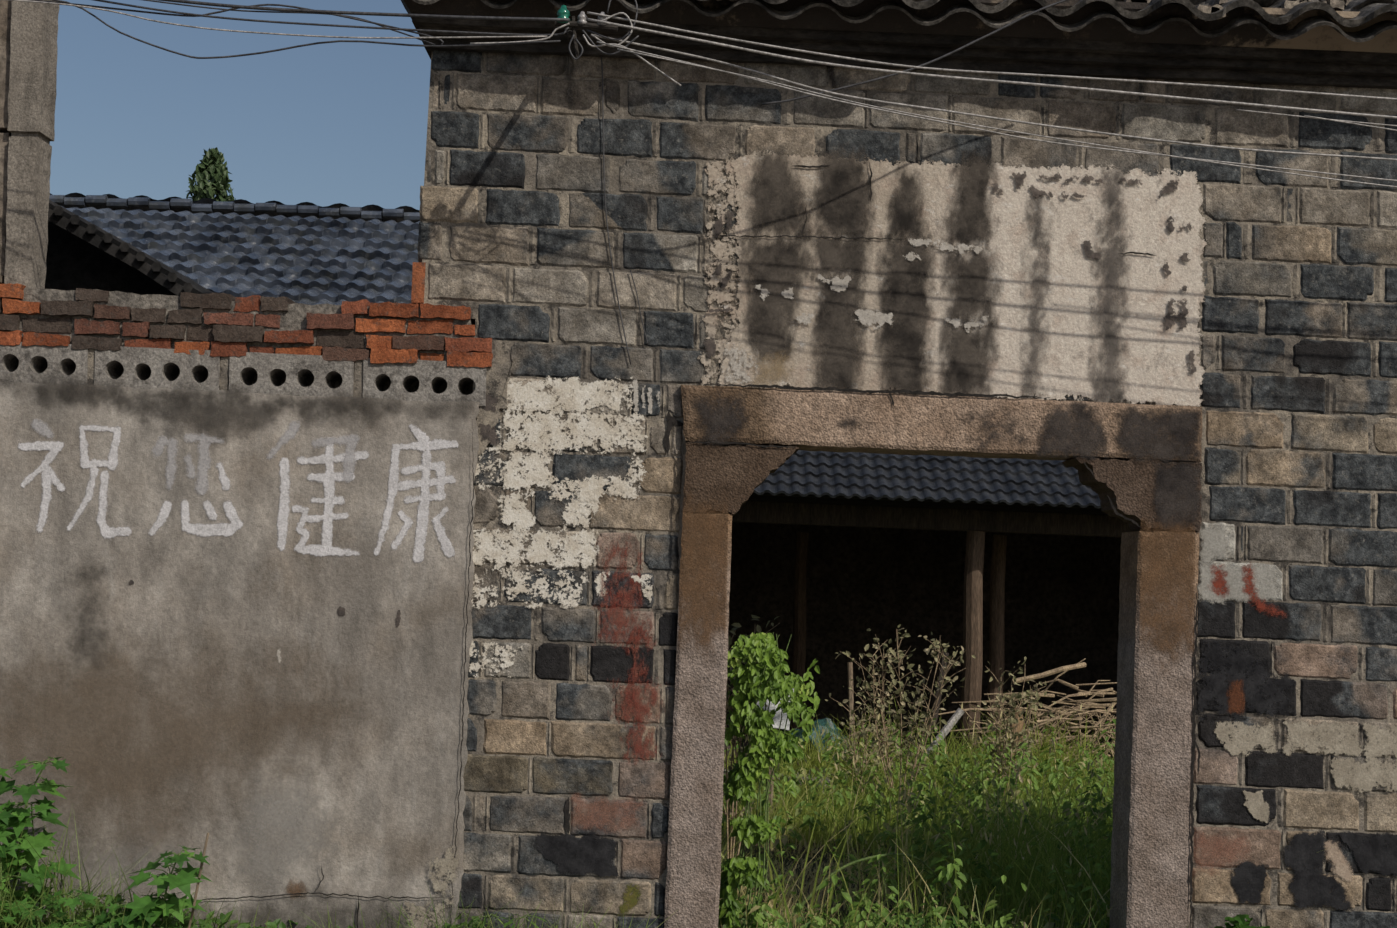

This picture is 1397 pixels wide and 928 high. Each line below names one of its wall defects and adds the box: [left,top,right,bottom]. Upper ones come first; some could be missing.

flaking render [715,263,732,291]
leakage [742,148,1000,397]
flaking render [703,338,758,384]
leakage [970,168,1202,530]
peeling [471,375,661,609]
peeling [469,640,523,677]
leakage [0,675,312,805]